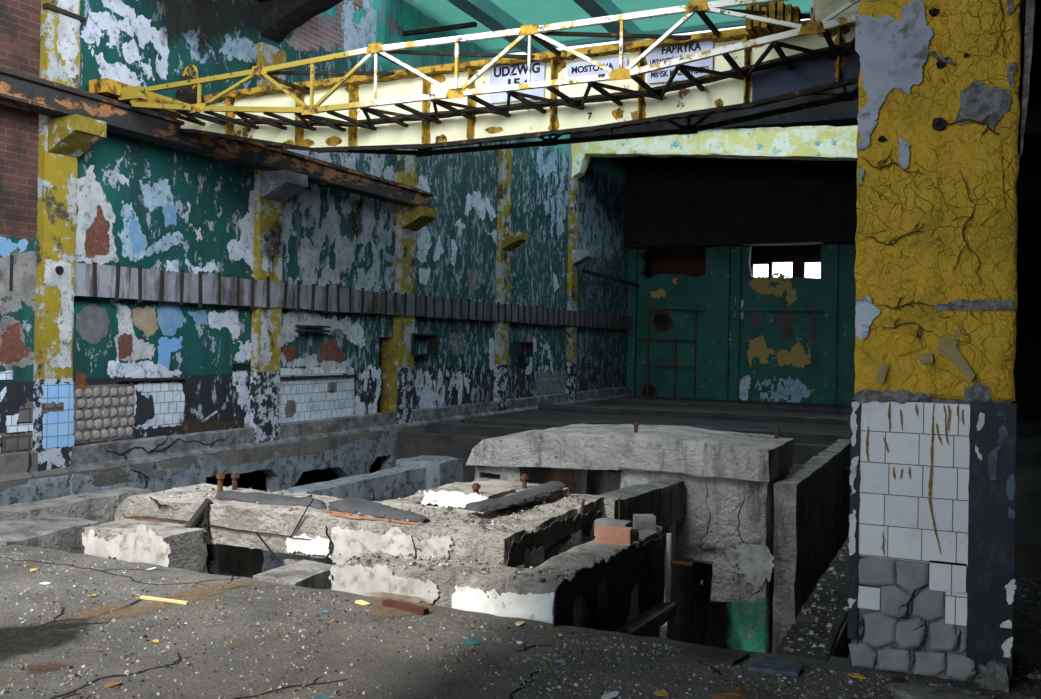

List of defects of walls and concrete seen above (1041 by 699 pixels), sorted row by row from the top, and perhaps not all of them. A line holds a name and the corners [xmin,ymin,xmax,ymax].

peeling [855,0,933,150]
corrosion [283,136,342,149]
crack [861,148,924,175]
flaking render [0,104,218,371]
crack [876,297,934,346]
spalling [0,429,398,506]
corrosion [928,404,964,554]
peeling [262,525,453,605]
peeling [452,535,666,636]
crack [899,585,928,669]
crack [50,652,189,699]
crack [234,676,347,699]